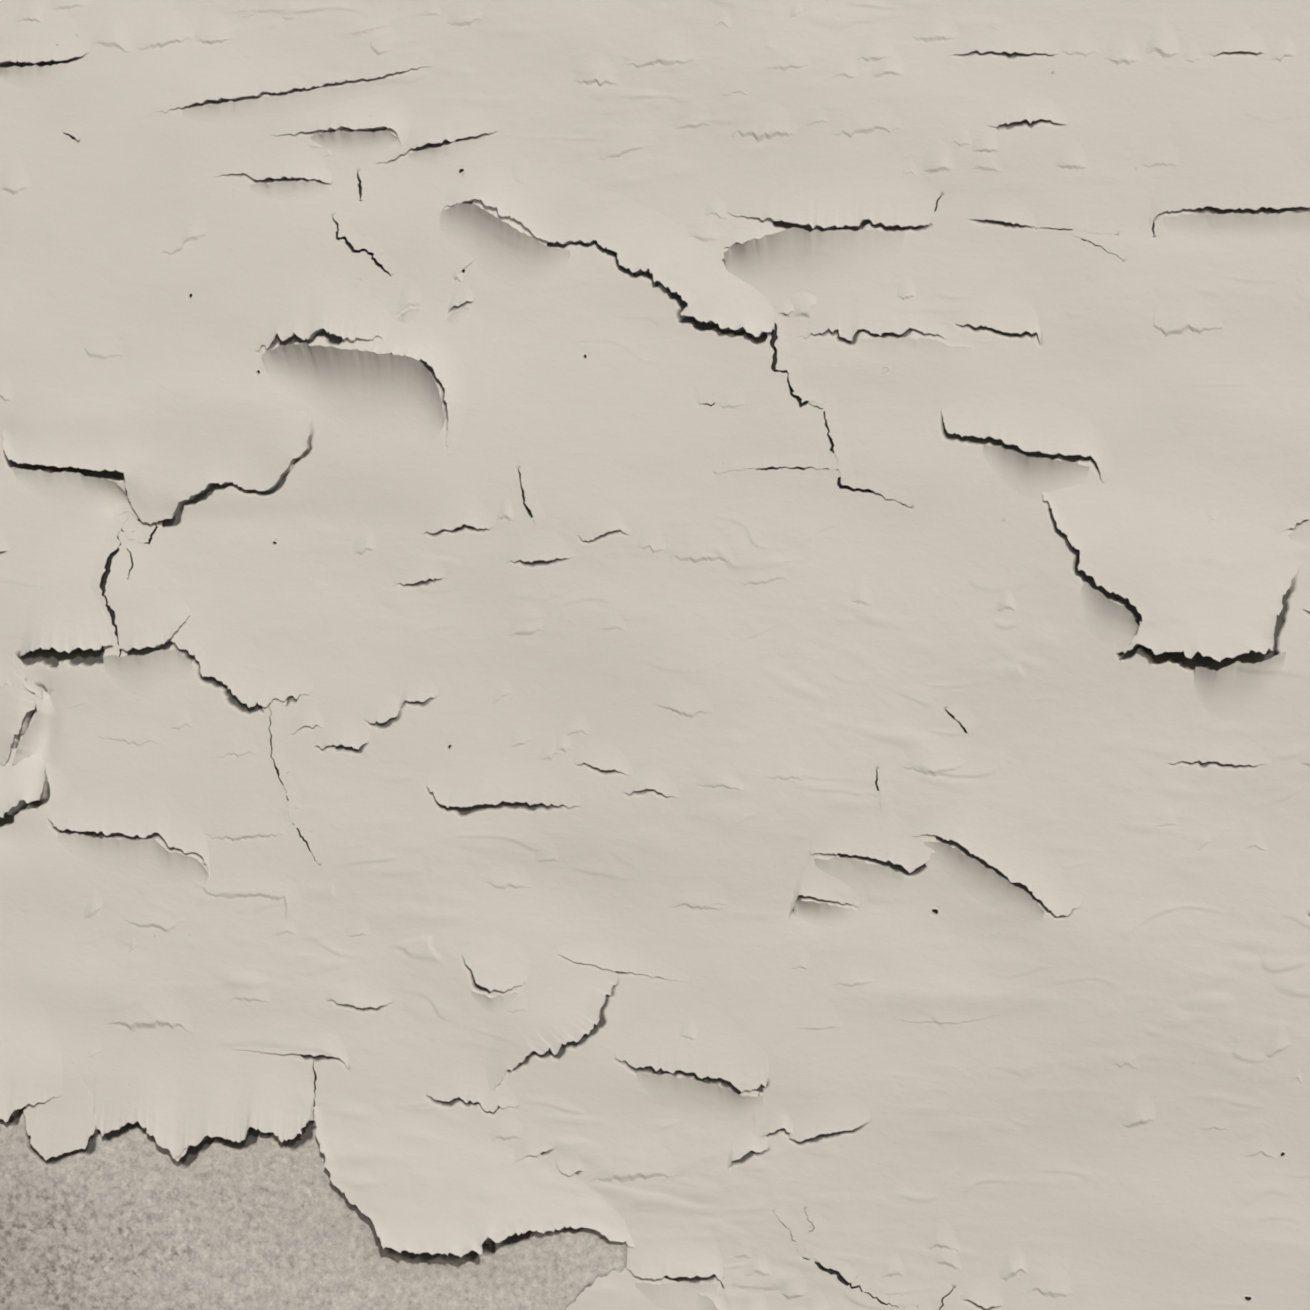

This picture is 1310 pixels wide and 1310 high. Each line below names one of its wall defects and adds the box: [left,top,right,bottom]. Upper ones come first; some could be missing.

peeling [0,6,90,88]
peeling [947,19,1297,65]
peeling [1139,115,1310,255]
peeling [0,27,1089,927]
crack [699,309,915,513]
peeling [941,392,1310,767]
flaking render [0,967,741,1310]
peeling [427,934,689,1113]
peeling [616,1000,870,1169]